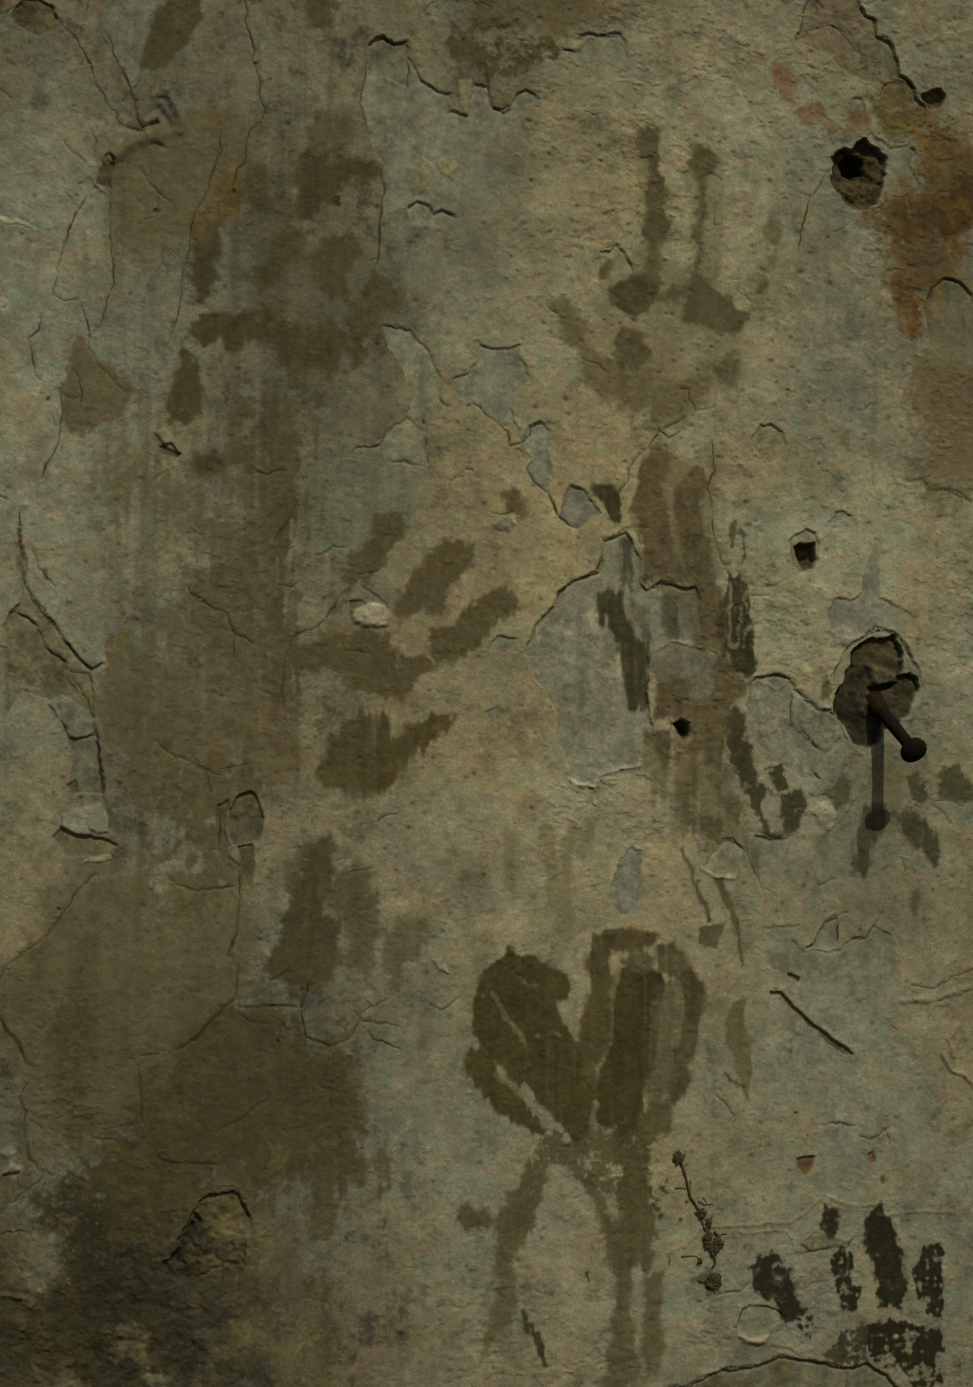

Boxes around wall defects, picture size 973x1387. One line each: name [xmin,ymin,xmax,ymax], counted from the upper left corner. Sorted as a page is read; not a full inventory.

crack [485,66,539,112]
crack [559,33,618,54]
crack [795,0,918,101]
crack [798,170,908,249]
corrosion [847,96,973,345]
crack [926,276,973,304]
flaking render [2,534,119,865]
damp [0,97,434,1288]
flaking render [746,538,925,781]
crack [667,1346,899,1387]